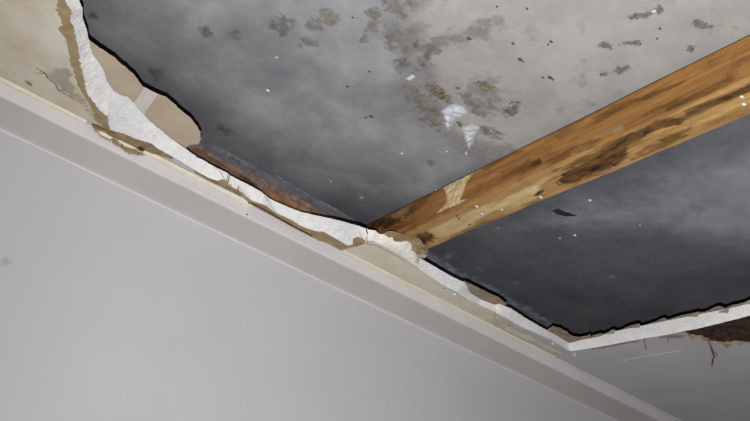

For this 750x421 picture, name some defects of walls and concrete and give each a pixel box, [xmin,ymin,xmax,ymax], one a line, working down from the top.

peeling [49,0,750,250]
spalling [405,258,592,351]